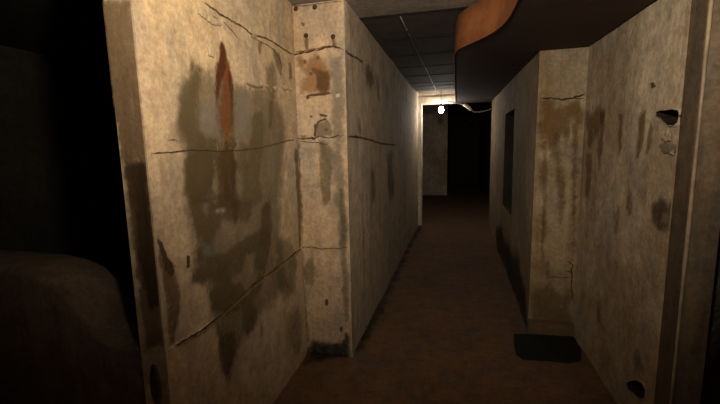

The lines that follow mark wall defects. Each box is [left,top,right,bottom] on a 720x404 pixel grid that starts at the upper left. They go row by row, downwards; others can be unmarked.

crack [206,3,363,64]
rust [215,42,235,178]
crack [151,135,395,154]
rust [303,56,330,92]
spalling [310,114,332,136]
crack [543,93,584,101]
spalling [655,108,682,156]
damp [178,65,286,375]
damp [652,200,671,230]
crack [175,246,347,347]
damp [305,227,422,364]
hole [626,378,648,400]